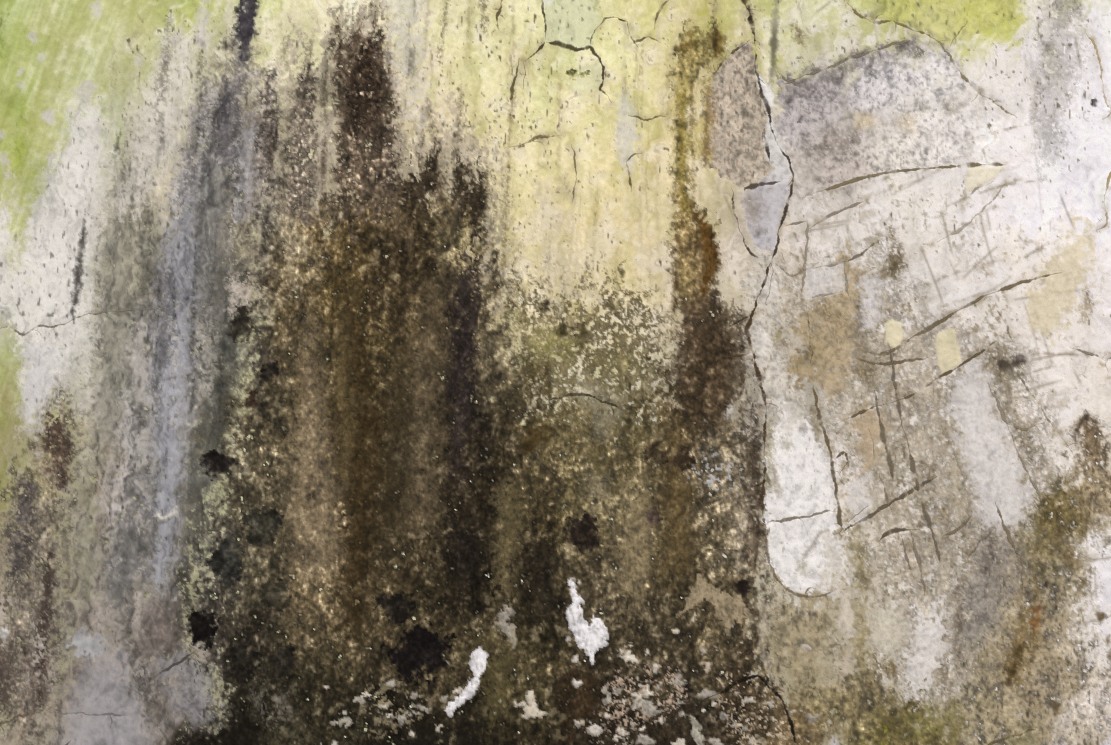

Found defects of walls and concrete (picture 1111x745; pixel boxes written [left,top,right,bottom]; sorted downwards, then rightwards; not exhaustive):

damp [434,0,451,68]
damp [565,67,592,81]
crack [510,1,667,99]
crack [1089,37,1109,116]
crack [1102,172,1111,228]
crack [719,0,969,597]
peeling [695,0,1028,705]
crack [551,393,618,411]
damp [779,210,1111,745]
peeling [934,326,1111,553]
peeling [564,573,833,745]
damp [620,714,644,745]